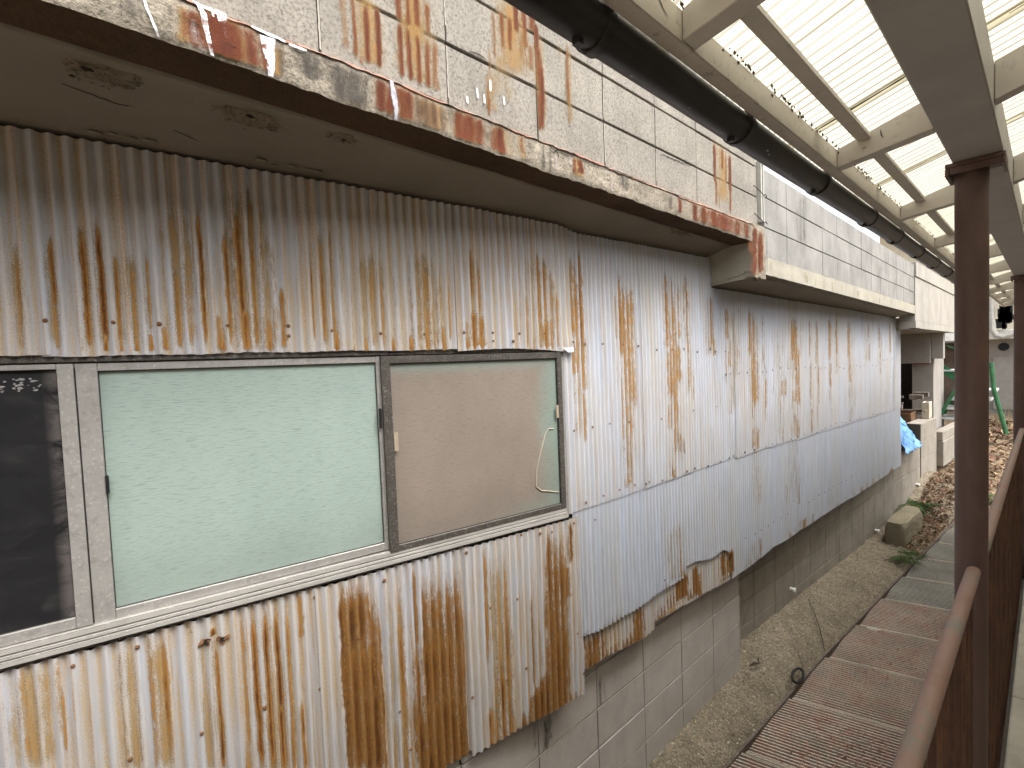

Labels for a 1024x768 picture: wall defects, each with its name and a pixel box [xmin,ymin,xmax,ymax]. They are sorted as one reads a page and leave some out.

rust [340,0,382,66]
rust [376,0,545,153]
rust [78,190,288,351]
rust [678,144,764,274]
rust [615,278,637,483]
rust [664,275,694,477]
rust [705,300,852,504]
rust [148,645,174,766]
rust [201,628,225,767]
rust [241,596,307,768]
rust [338,572,468,768]
rust [483,523,578,744]